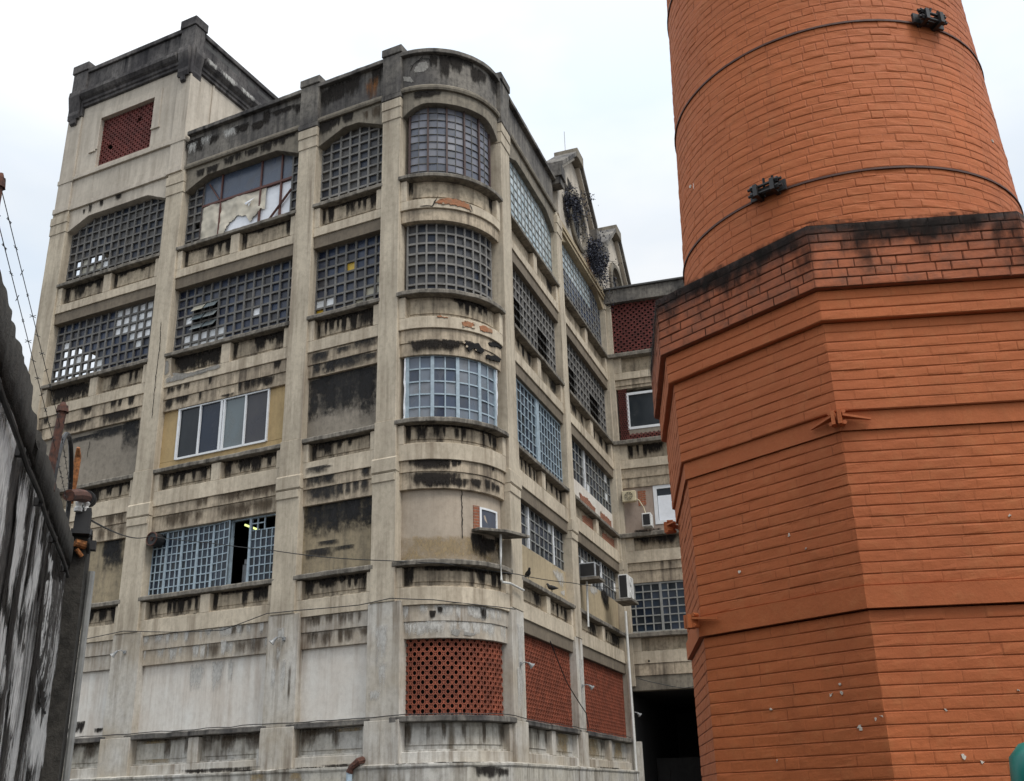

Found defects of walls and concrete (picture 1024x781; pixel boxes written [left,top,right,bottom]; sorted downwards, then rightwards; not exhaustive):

water stain [415,90,441,98]
water stain [430,54,497,94]
water stain [185,103,301,152]
water stain [197,132,296,176]
water stain [679,261,743,294]
water stain [409,339,472,352]
spalling [462,320,502,363]
water stain [309,337,377,416]
water stain [409,459,500,492]
water stain [306,467,372,558]
water stain [0,453,66,781]